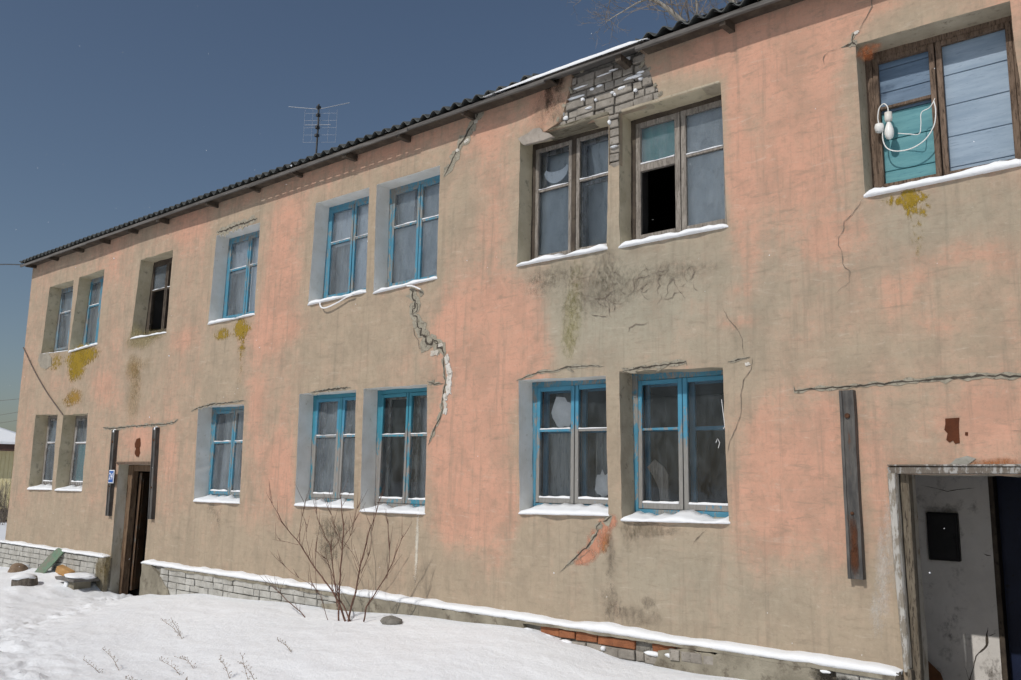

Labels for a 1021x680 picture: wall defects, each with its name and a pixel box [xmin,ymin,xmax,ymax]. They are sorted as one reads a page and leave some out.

spalling [518,50,721,167]
crack [443,111,484,177]
crack [571,262,698,339]
crack [406,287,453,444]
crack [516,359,687,381]
crack [793,372,1021,393]
corrosion [944,418,968,444]
peeling [576,516,616,564]